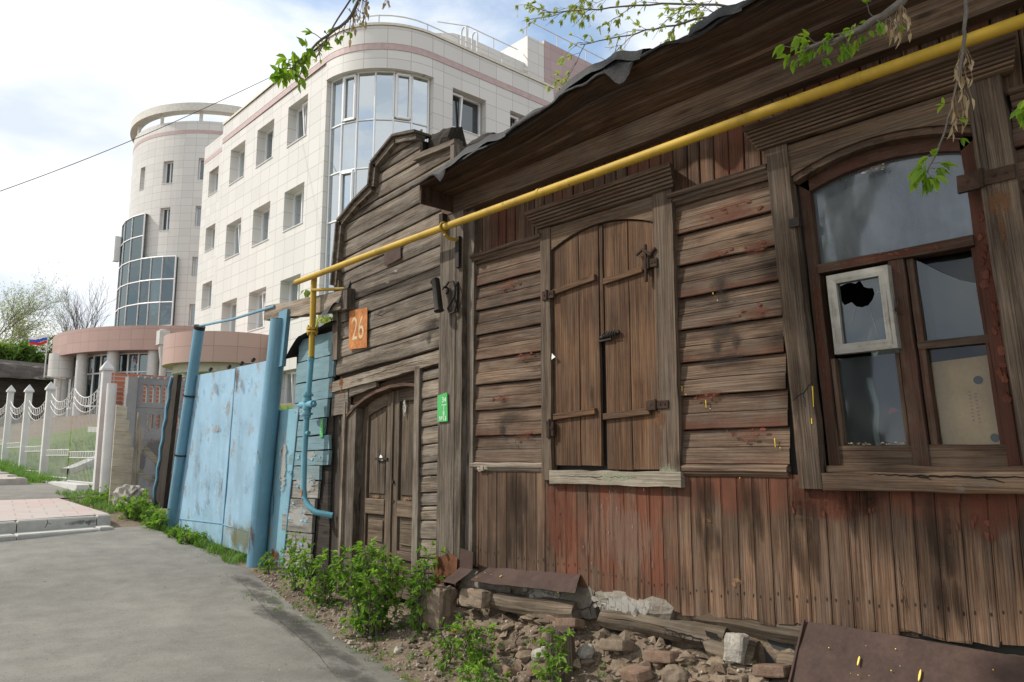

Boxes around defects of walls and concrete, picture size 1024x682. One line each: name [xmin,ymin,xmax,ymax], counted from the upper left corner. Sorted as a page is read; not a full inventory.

peeling [279,440,320,494]
crack [867,473,1024,483]
spalling [591,596,637,617]
corrosion [788,619,1024,682]